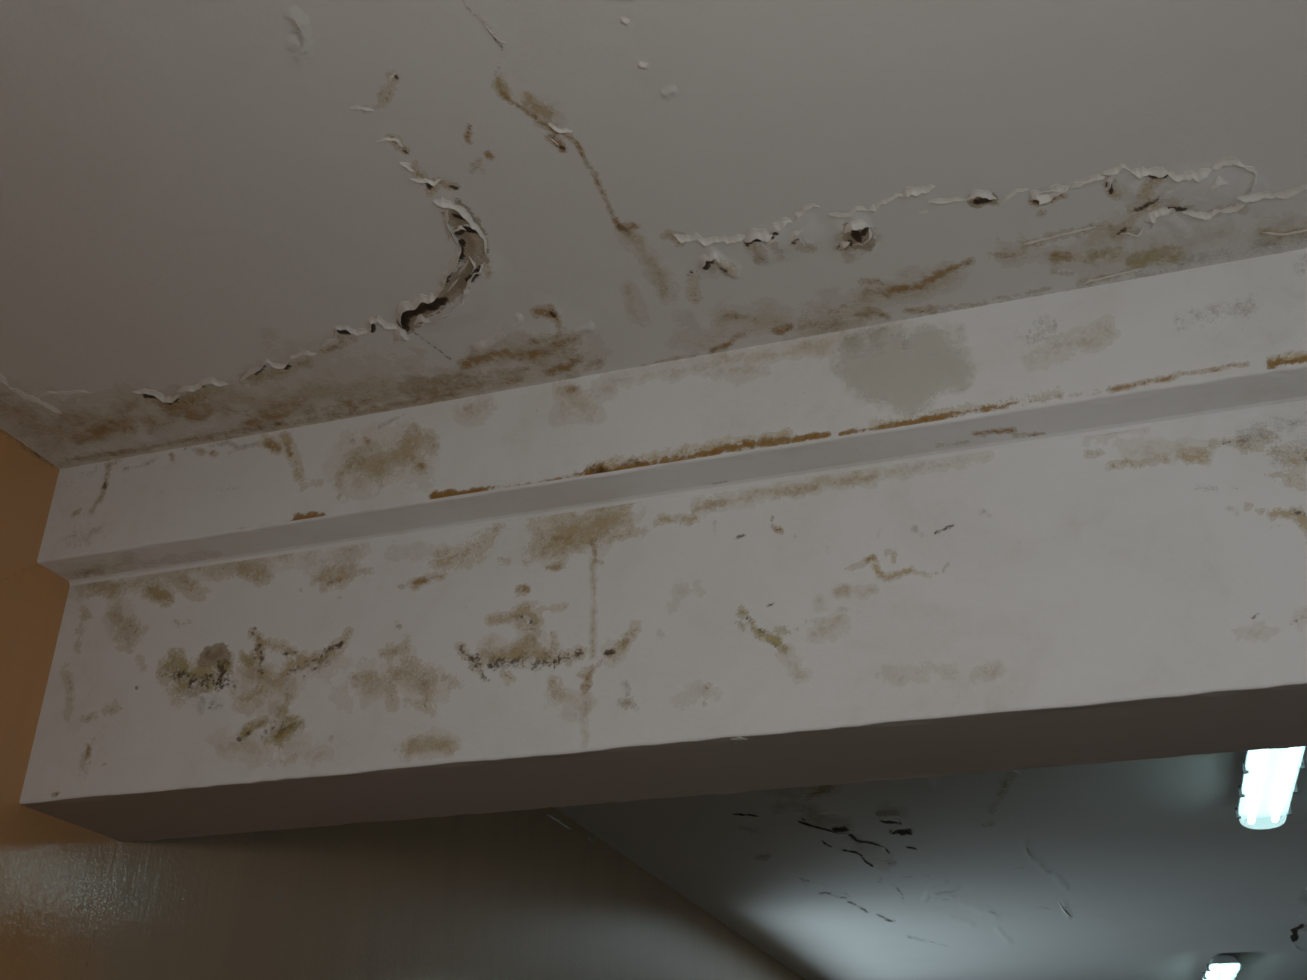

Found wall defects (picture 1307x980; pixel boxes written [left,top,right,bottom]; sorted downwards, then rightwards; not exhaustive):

peeling [669,157,1307,281]
peeling [133,137,516,405]
leakage [878,261,972,296]
leakage [434,290,598,392]
leakage [840,329,969,411]
leakage [160,627,348,708]
leakage [458,586,591,688]
leakage [741,610,785,650]
leakage [237,706,301,743]
crack [798,810,900,922]